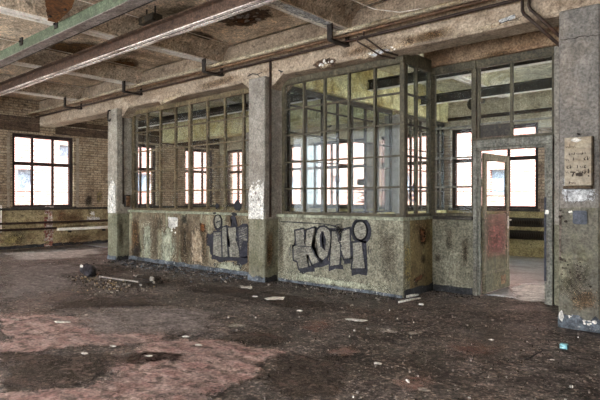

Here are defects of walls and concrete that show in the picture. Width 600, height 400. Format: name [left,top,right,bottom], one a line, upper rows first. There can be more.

spalling [218,0,331,27]
peeling [248,180,264,219]
damp [161,216,203,265]